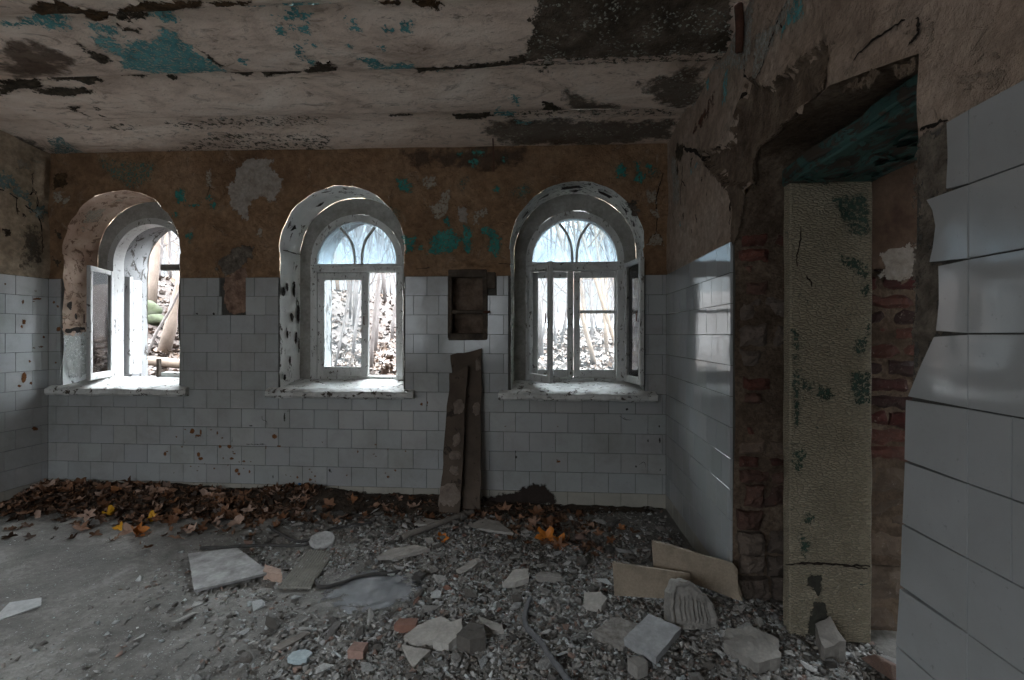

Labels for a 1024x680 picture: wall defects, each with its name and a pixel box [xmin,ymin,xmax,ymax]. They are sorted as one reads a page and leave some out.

leakage [0,39,75,79]
peeling [0,76,133,131]
peeling [1,0,341,80]
leakage [402,0,733,172]
peeling [346,0,916,246]
crack [854,17,921,60]
peeling [165,115,332,221]
peeling [377,176,502,258]
peeling [839,122,953,385]
peeling [62,302,86,378]
crack [786,561,870,569]
peeling [804,575,828,639]